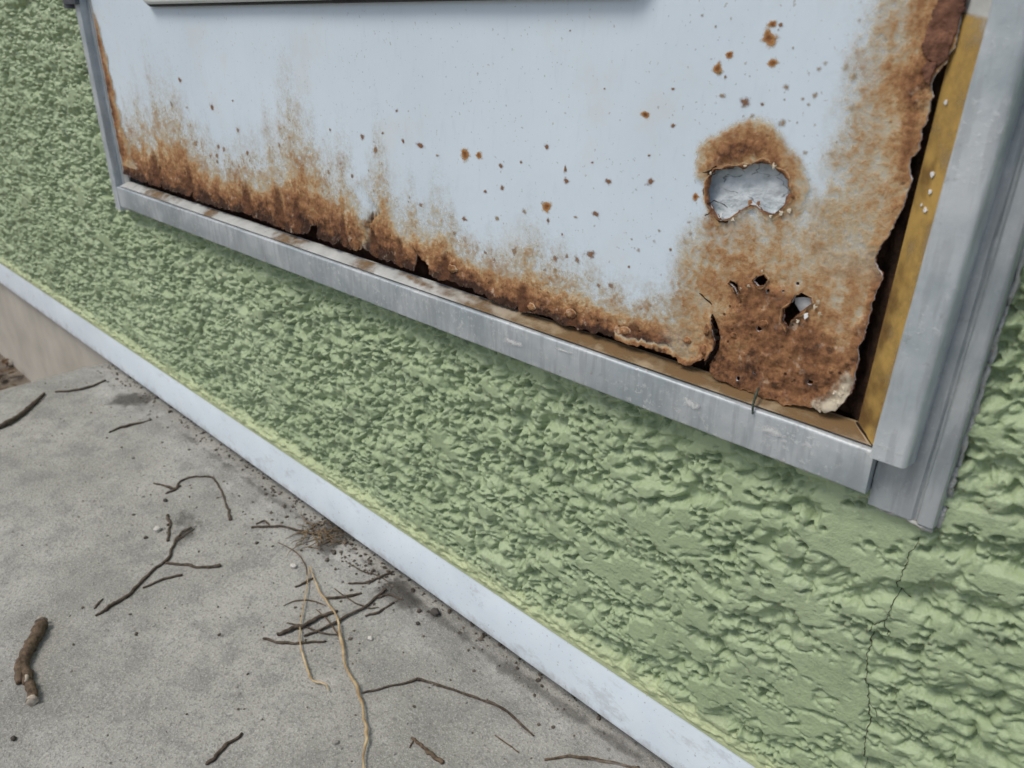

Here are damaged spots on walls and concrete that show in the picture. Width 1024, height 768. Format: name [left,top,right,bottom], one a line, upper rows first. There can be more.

rust [93,0,981,444]
crack [864,538,919,768]